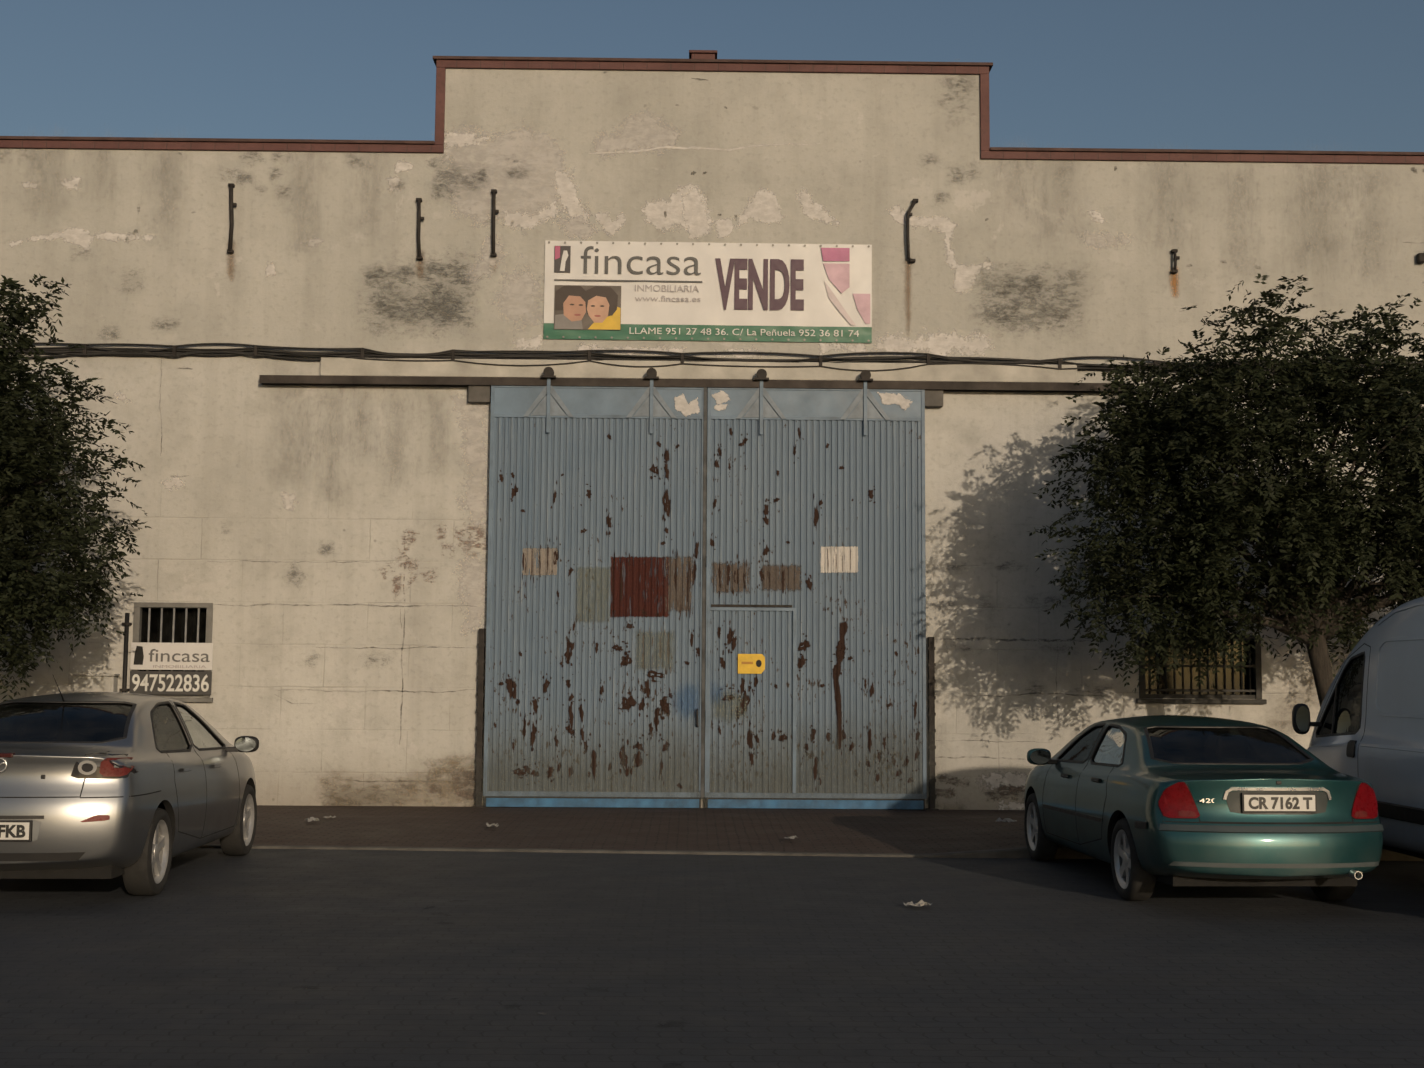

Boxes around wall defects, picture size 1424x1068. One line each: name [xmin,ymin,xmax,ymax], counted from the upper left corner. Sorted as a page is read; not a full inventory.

peeling [443,127,785,350]
peeling [888,206,994,294]
leakage [367,265,465,325]
leakage [982,276,1078,329]
peeling [578,342,686,355]
corrosion [610,436,812,620]
peeling [499,621,682,789]
peeling [717,620,788,771]
peeling [797,633,811,671]
peeling [802,725,831,789]
corrosion [830,621,853,756]
peeling [849,700,921,788]